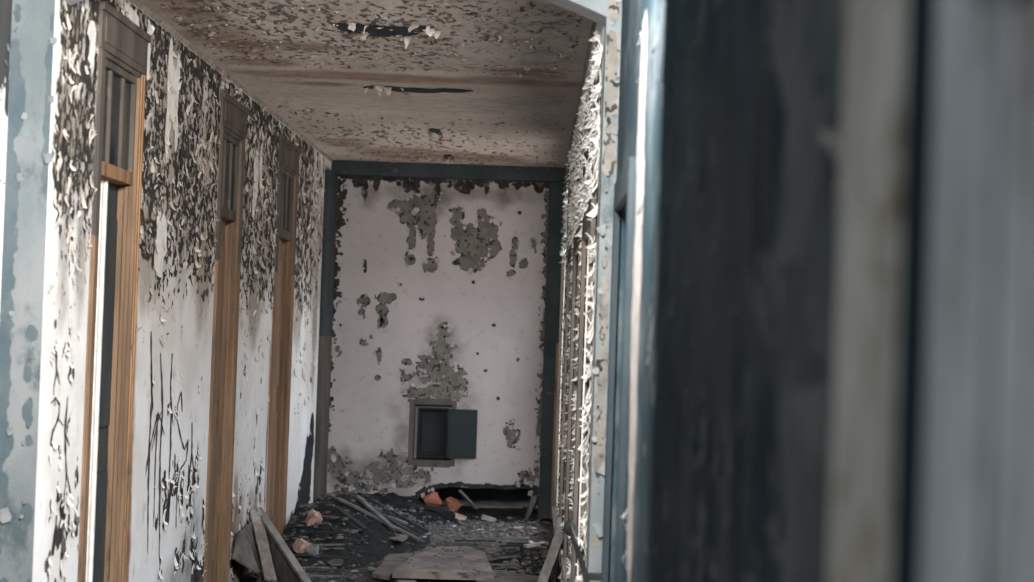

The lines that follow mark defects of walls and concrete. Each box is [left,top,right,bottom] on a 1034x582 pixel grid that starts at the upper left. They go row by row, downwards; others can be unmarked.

peeling [0,0,38,533]
peeling [41,0,622,582]
peeling [27,441,79,582]
crack [50,351,71,498]
crack [146,331,194,562]